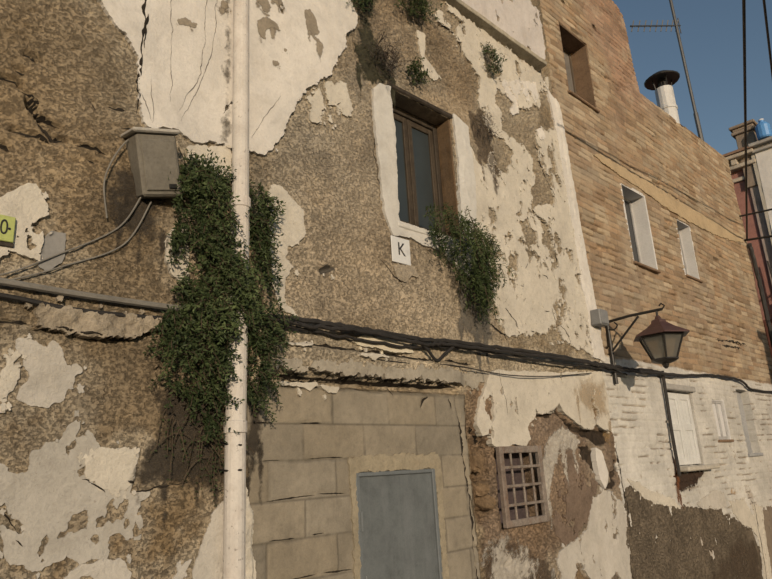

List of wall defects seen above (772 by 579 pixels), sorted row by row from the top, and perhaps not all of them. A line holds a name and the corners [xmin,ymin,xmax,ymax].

crack [0,55,106,163]
crack [89,0,217,130]
flaking render [96,0,233,181]
flaking render [249,0,358,156]
flaking render [415,30,441,81]
flaking render [0,183,52,262]
flaking render [428,0,632,579]
flaking render [0,333,87,413]
flaking render [0,410,150,579]
leakage [133,388,224,504]
flaking render [673,470,704,492]
flaking render [697,490,772,579]